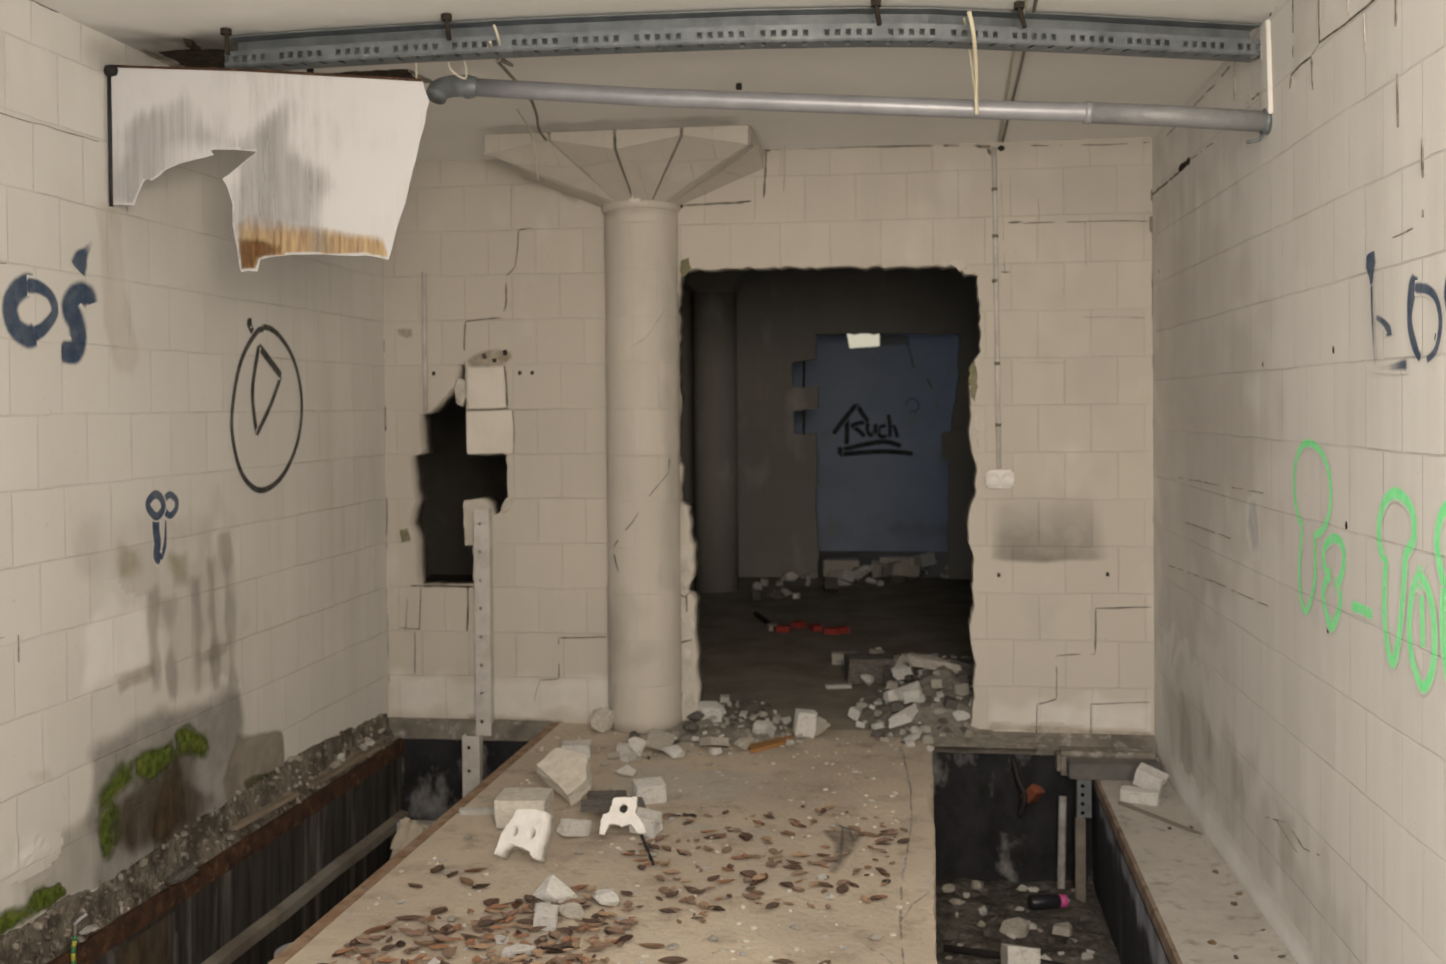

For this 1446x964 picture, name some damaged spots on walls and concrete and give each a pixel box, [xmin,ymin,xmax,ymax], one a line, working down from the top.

spalling [330,69,433,83]
spalling [946,259,968,272]
peeling [454,379,467,406]
spalling [968,360,981,447]
spalling [501,498,513,514]
damp [42,456,284,892]
spalling [680,549,698,709]
crack [1035,606,1149,734]
spalling [91,755,402,964]